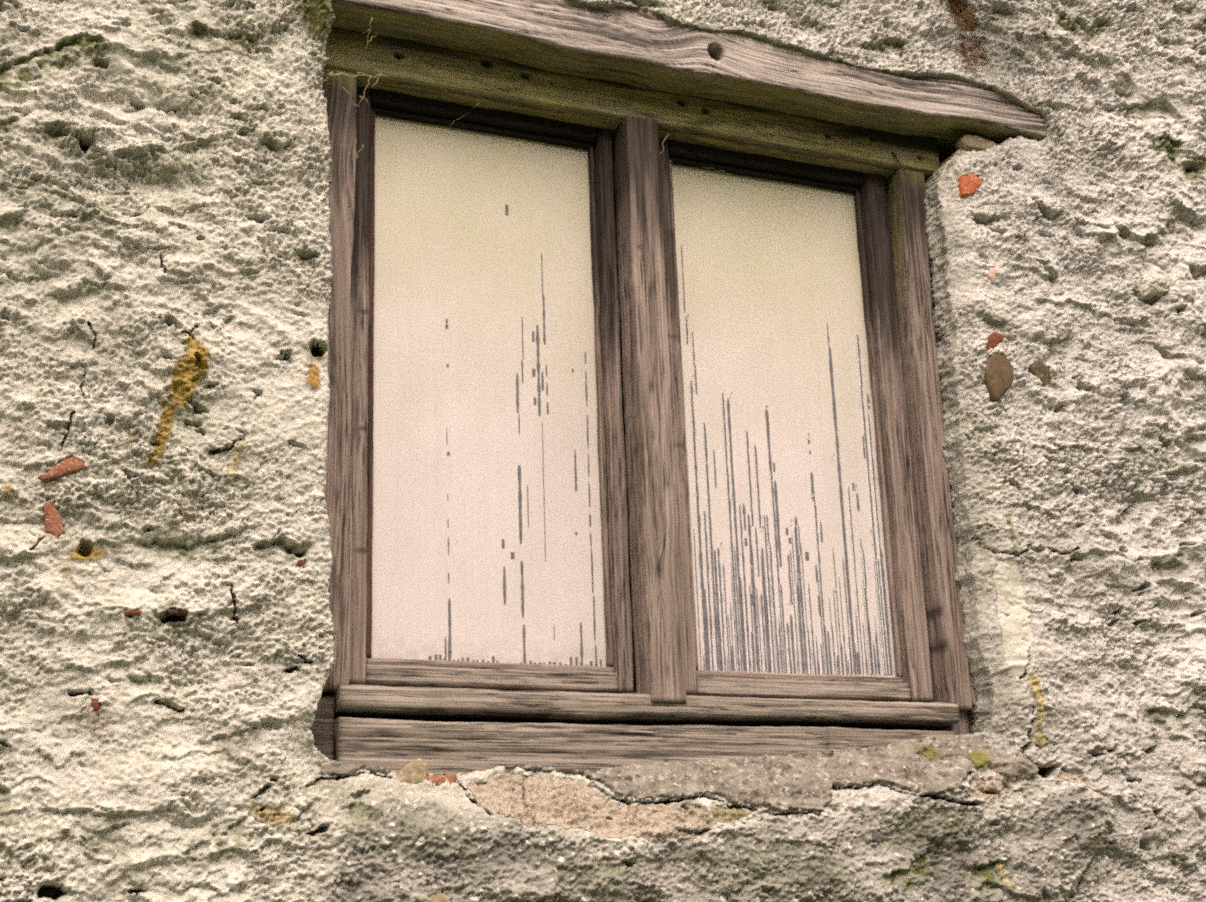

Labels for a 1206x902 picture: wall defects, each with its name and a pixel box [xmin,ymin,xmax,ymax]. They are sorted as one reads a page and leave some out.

rust [948,0,985,75]
crack [457,783,491,815]
flaking render [466,771,750,842]
crack [595,784,975,816]